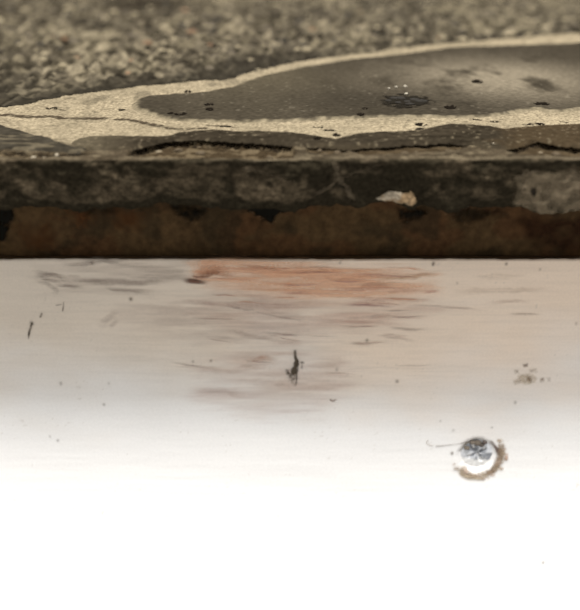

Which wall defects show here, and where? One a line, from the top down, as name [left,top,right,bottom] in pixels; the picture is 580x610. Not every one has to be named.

spalling [128,141,295,160]
spalling [306,144,463,155]
spalling [508,141,580,157]
corrosion [187,262,409,297]